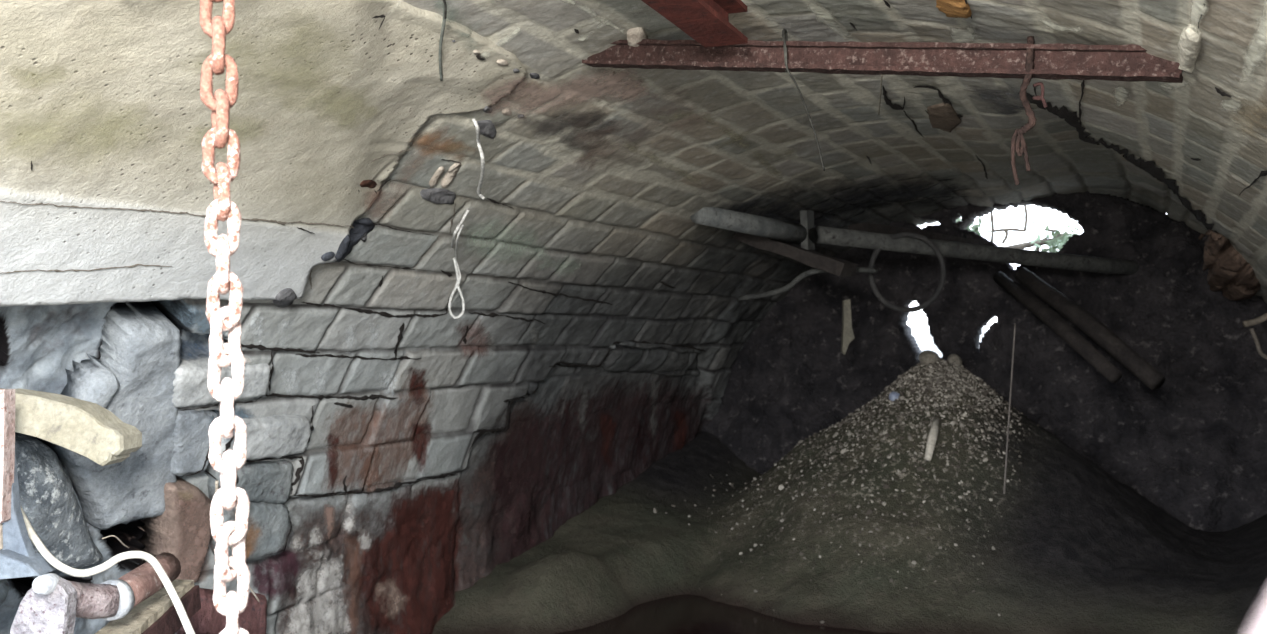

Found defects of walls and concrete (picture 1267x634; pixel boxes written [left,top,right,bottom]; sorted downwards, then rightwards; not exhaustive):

crack [1215,87,1231,98]
damp [538,112,613,143]
crack [1018,80,1218,234]
crack [1239,171,1267,196]
crack [0,201,206,217]
crack [241,202,456,236]
crack [0,264,172,274]
crack [177,259,705,498]
corrosion [327,368,431,495]
corrosion [245,527,299,597]
corrosion [346,481,463,634]